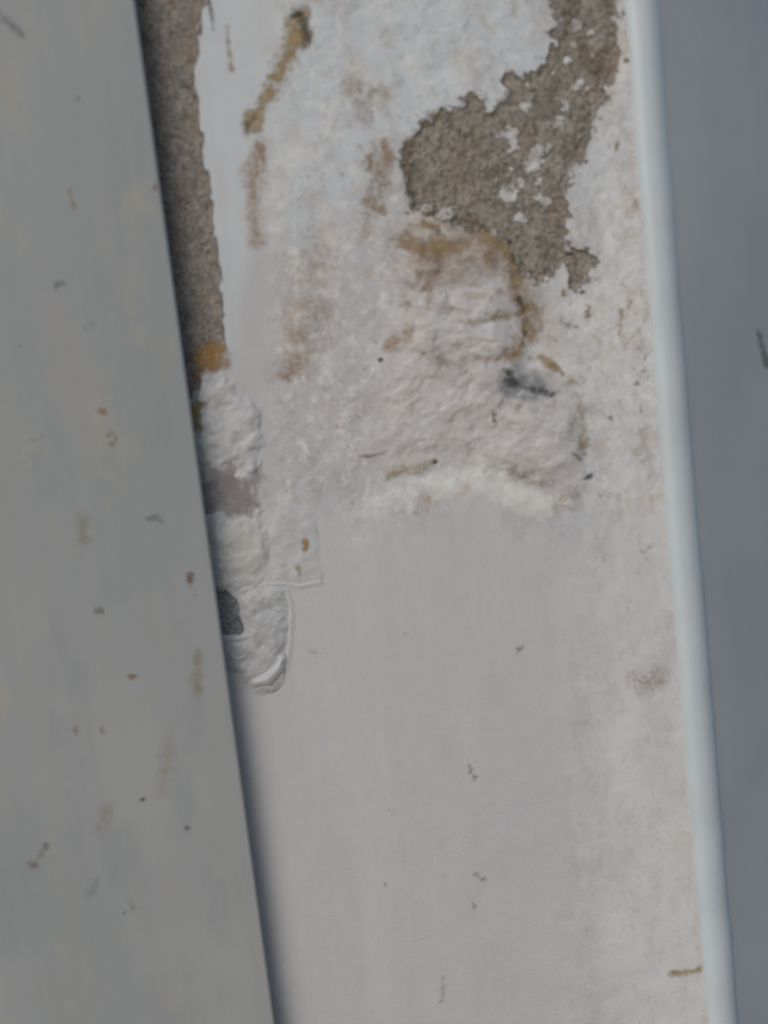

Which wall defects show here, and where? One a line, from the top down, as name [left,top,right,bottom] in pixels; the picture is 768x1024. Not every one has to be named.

spalling [135,0,225,399]
corrosion [244,9,311,133]
leakage [400,220,463,260]
spalling [396,0,629,296]